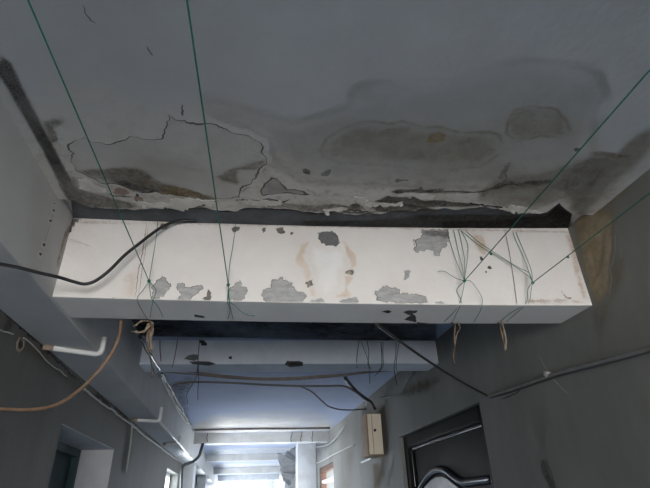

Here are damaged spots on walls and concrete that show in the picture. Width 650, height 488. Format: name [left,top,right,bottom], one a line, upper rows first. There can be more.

leakage [0,57,177,210]
peeling [57,108,573,259]
leakage [260,131,650,238]
peeling [149,274,213,300]
peeling [224,279,250,301]
peeling [259,275,326,303]
peeling [372,269,448,326]